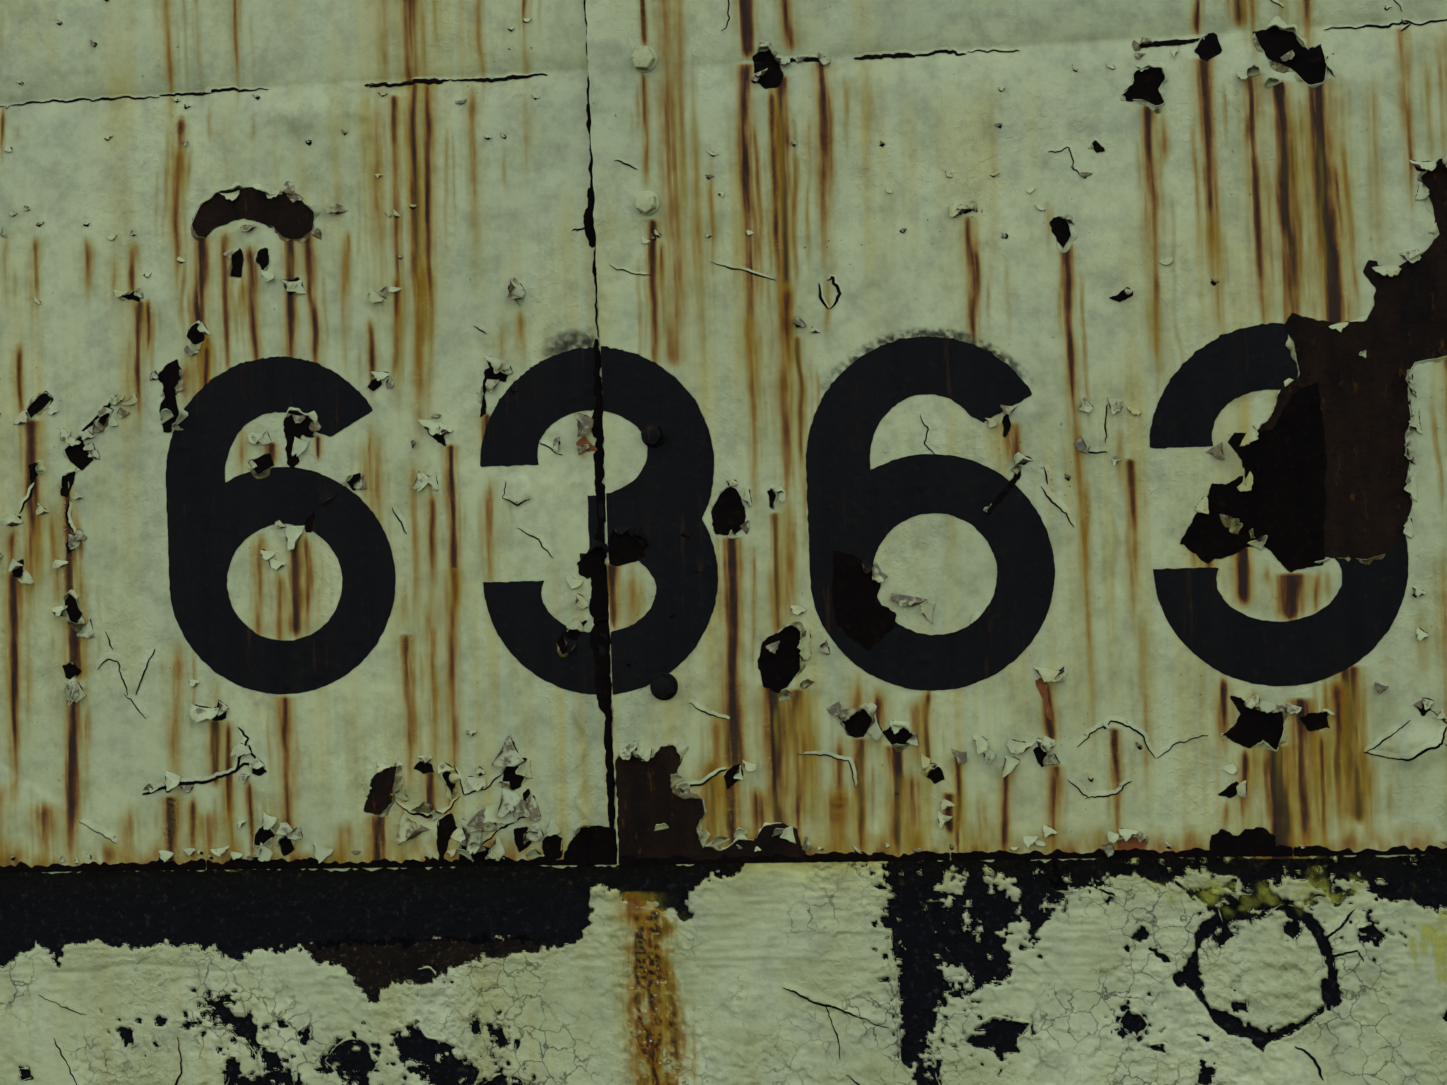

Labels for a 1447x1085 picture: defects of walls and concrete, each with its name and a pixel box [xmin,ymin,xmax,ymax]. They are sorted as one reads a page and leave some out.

rust [374,0,434,398]
rust [737,0,819,498]
rust [1244,76,1357,324]
peeling [1180,155,1447,572]
peeling [108,988,536,1085]
peeling [0,732,824,1003]
rust [0,513,1447,873]
crack [1068,715,1208,799]
peeling [852,825,1447,1085]
crack [1167,876,1197,901]
crack [1295,1043,1327,1081]
crack [1319,906,1369,962]